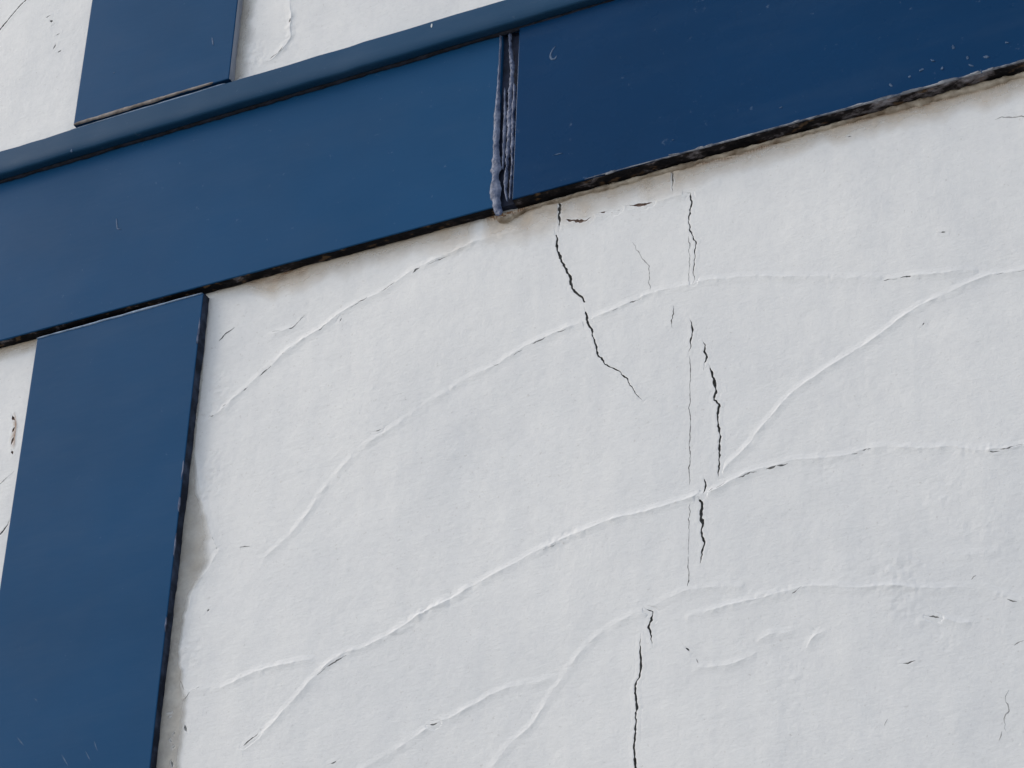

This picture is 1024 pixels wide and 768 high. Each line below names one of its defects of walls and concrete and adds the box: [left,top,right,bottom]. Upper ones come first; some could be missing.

crack [494,197,651,405]
crack [682,188,701,286]
crack [628,604,698,768]